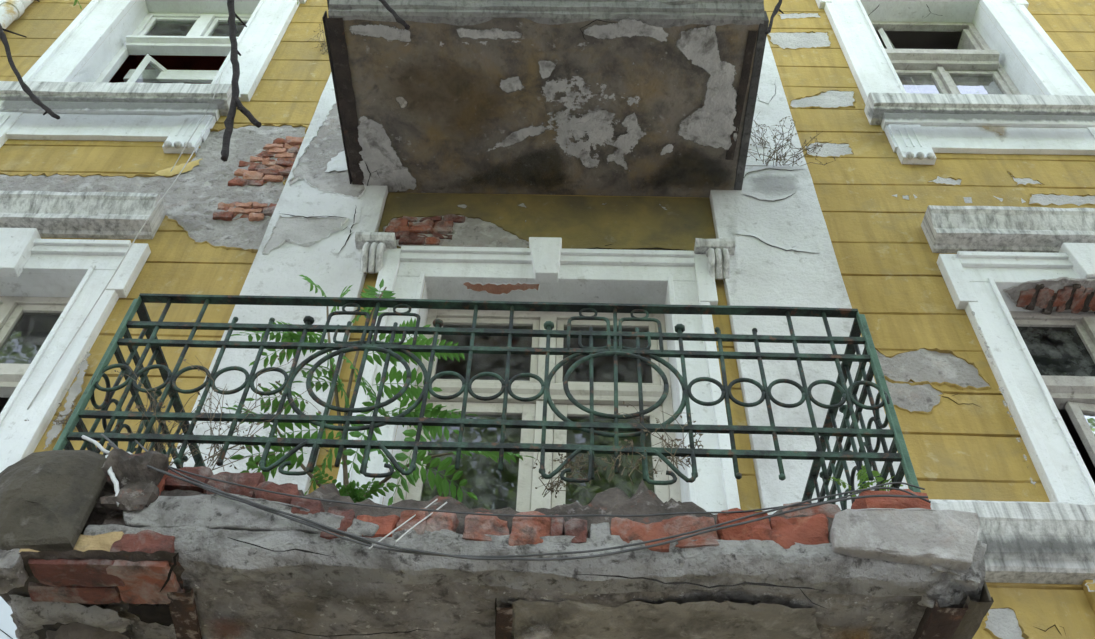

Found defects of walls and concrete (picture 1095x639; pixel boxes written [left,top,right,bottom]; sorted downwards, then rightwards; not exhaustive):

peeling [767,12,832,50]
peeling [577,18,738,155]
peeling [486,60,646,171]
flaking render [0,101,417,254]
water stain [475,149,561,186]
water stain [650,150,727,187]
spalling [381,204,529,248]
peeling [864,311,1037,484]
spalling [82,435,169,529]
crack [576,574,828,609]
peeling [982,607,1029,639]
crack [1033,620,1067,636]